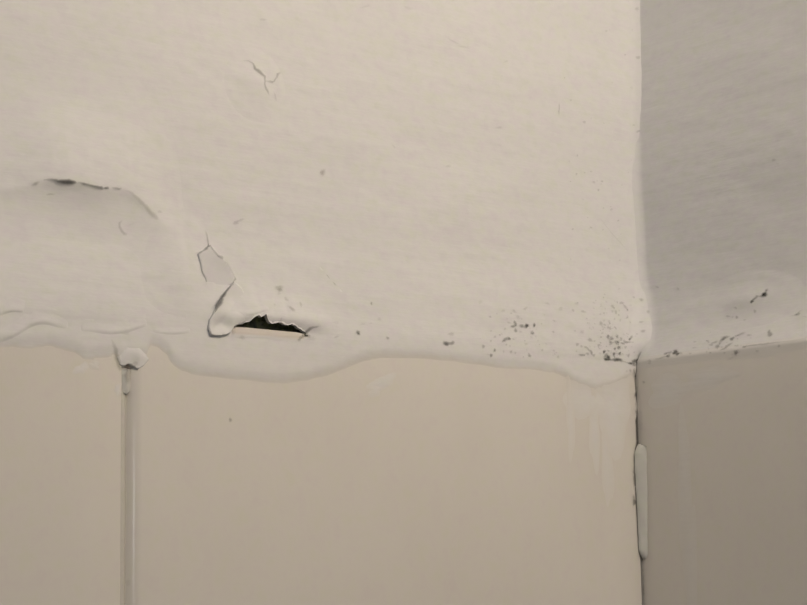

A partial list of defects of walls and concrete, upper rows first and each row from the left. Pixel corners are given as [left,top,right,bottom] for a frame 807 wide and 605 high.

spalling [186,245,349,342]